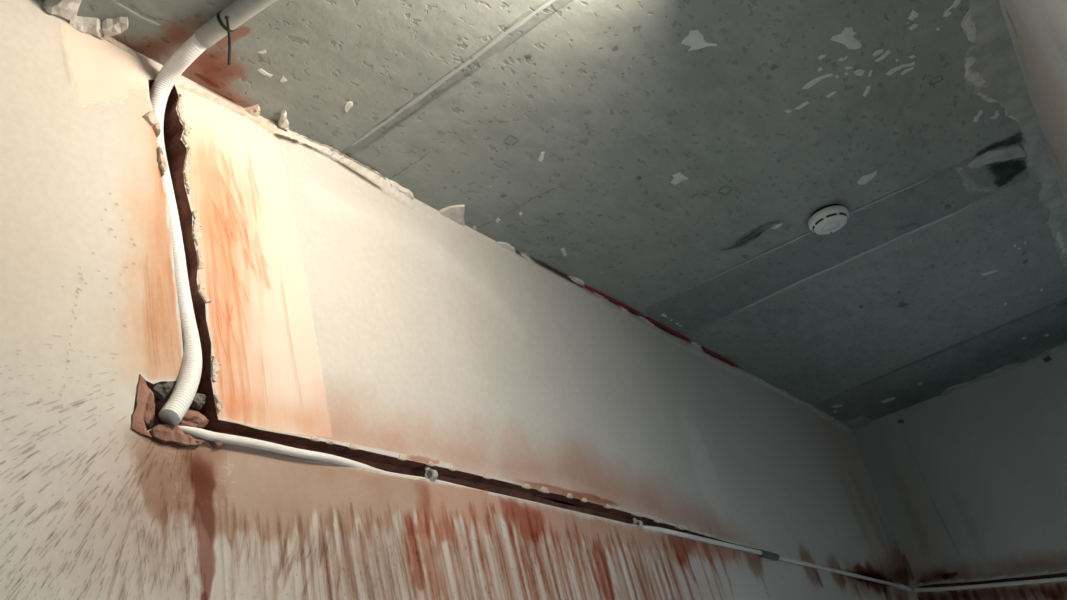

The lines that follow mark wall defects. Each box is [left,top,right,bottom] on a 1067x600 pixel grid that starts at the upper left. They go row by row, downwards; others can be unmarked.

peeling [43,0,128,41]
peeling [785,27,915,113]
peeling [964,56,1020,154]
spalling [989,160,1026,187]
peeling [149,424,224,448]